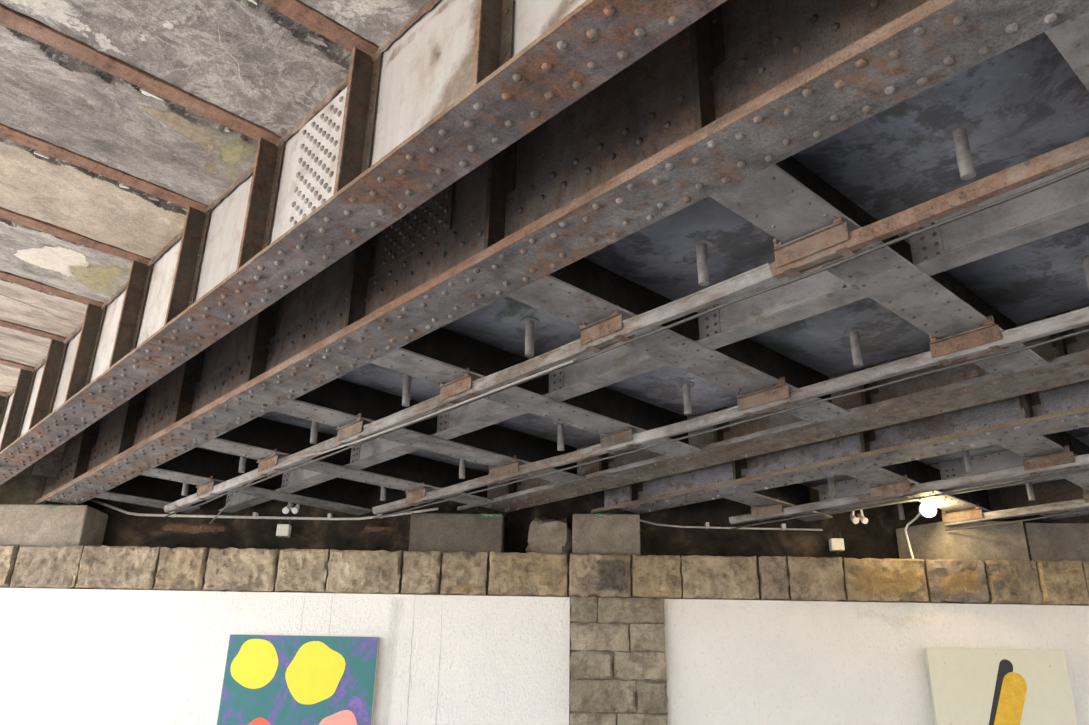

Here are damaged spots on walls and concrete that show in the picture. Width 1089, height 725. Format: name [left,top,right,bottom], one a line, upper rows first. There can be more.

peeling [0,218,90,278]